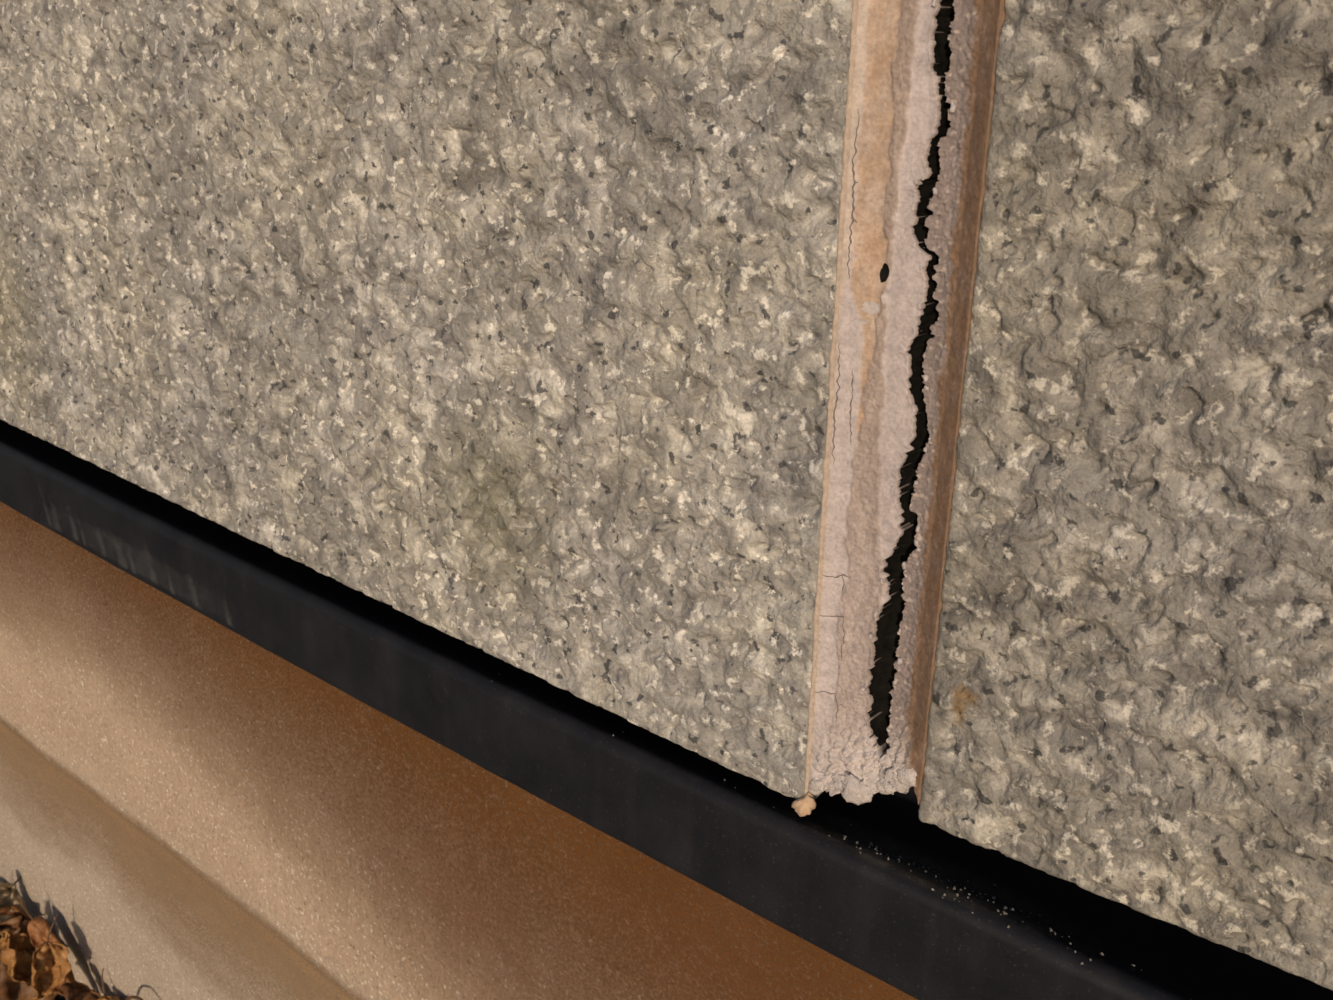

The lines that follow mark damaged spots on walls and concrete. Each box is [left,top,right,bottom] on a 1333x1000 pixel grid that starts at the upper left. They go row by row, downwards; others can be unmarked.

crack [815,0,956,754]